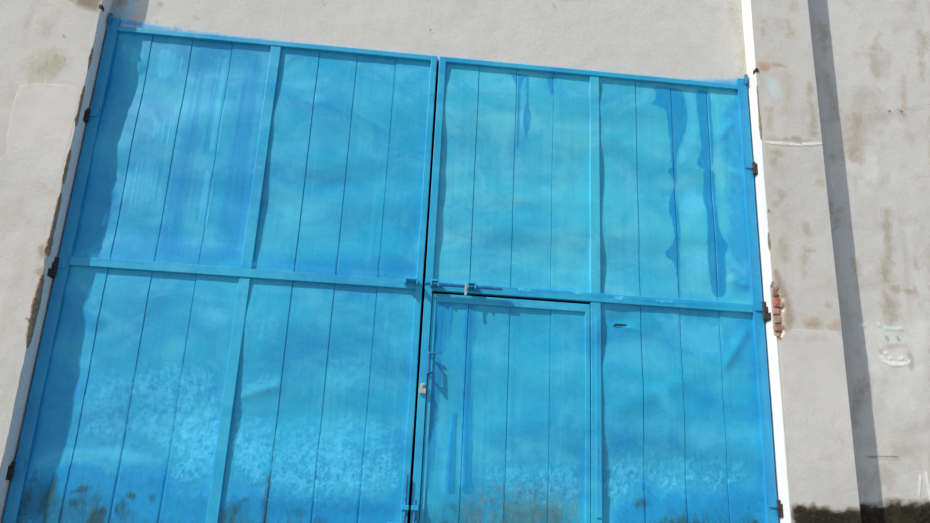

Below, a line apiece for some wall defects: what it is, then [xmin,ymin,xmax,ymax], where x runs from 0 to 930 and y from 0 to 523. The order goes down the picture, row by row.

spalling [772,270,792,340]
leakage [792,501,930,523]